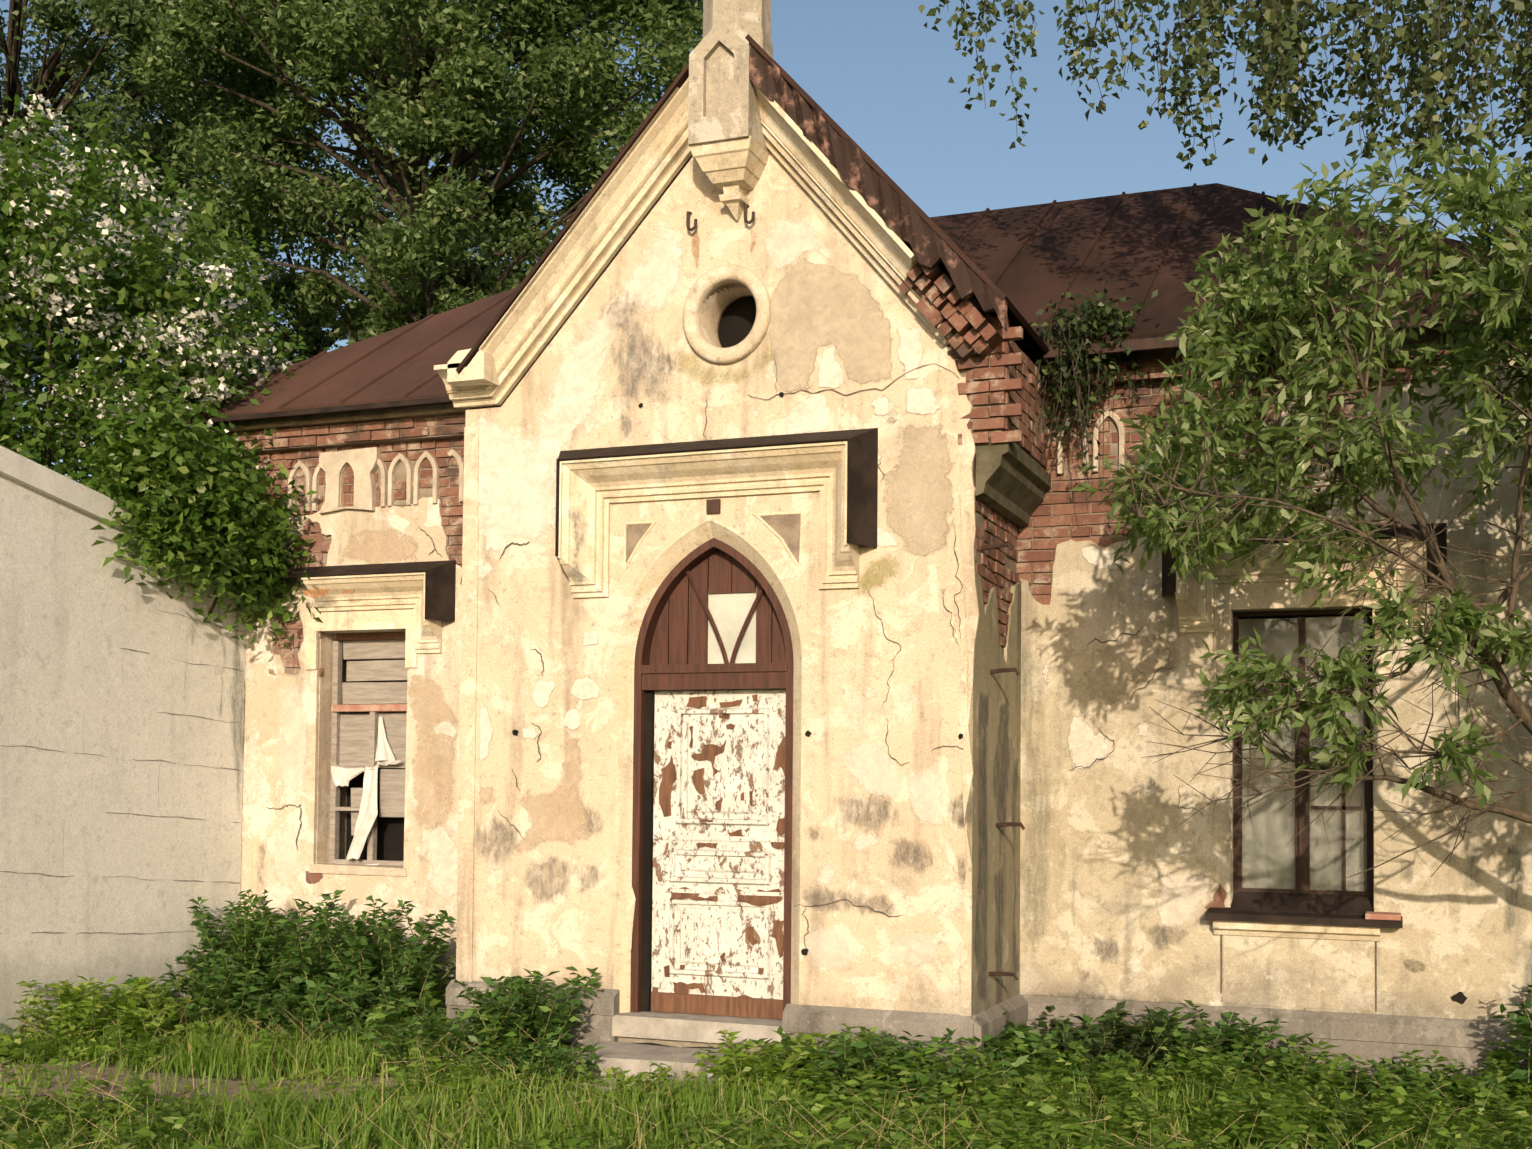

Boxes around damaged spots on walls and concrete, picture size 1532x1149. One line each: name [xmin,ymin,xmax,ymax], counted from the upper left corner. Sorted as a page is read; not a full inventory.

peeling [240,222,687,579]
leakage [618,311,671,394]
crack [748,350,960,400]
flaking render [764,219,1450,656]
crack [868,592,973,766]
peeling [659,694,758,822]
crack [1069,729,1115,771]
crack [267,804,302,851]
peeling [670,887,718,902]
peeling [737,889,784,958]
crack [793,899,901,949]
peeling [652,965,706,994]